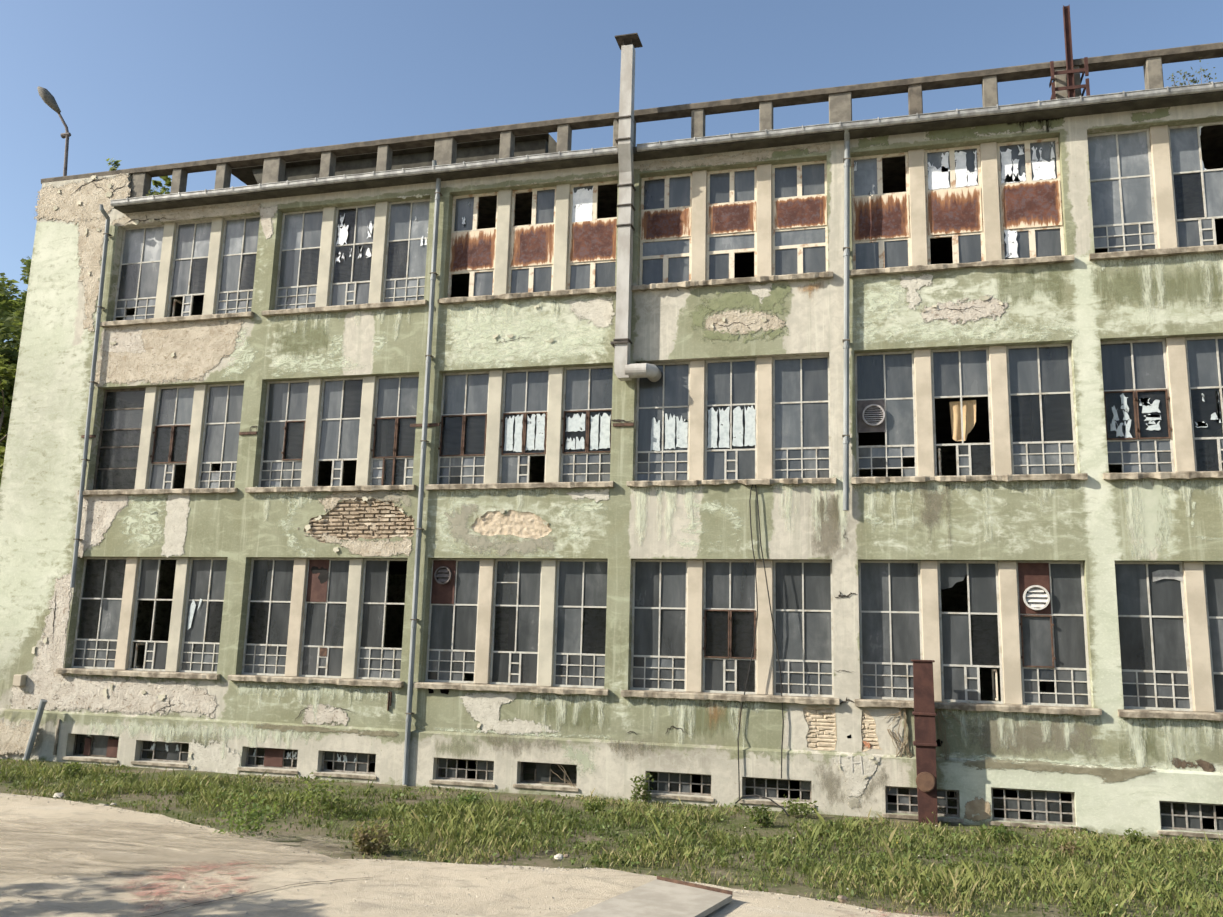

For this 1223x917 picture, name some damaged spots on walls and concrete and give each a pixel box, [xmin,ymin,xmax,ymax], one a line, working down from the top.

peeling [34,173,278,387]
peeling [705,283,786,335]
peeling [899,272,1008,325]
leakage [1095,253,1223,314]
spalling [297,490,415,557]
spalling [445,504,554,556]
leakage [772,476,1081,553]
peeling [9,573,217,719]
spalling [803,706,882,808]